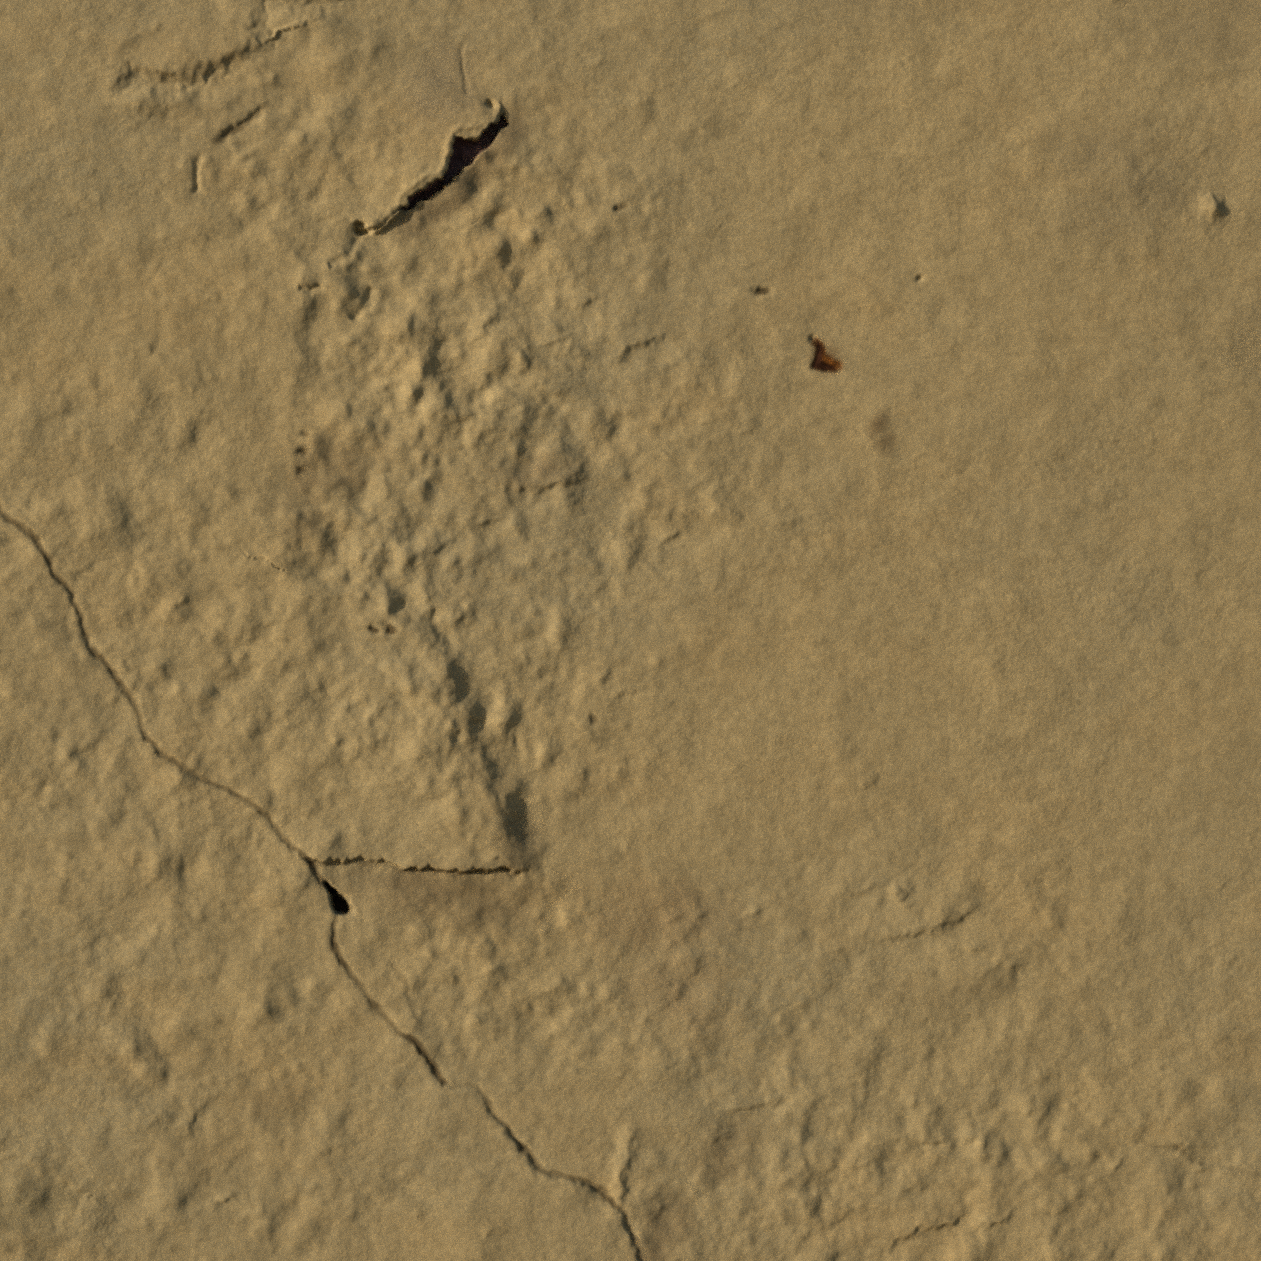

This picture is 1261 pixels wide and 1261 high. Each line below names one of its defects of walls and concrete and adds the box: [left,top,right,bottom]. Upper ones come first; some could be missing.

corrosion [811,339,841,371]
spalling [248,60,715,786]
spalling [287,771,565,953]
crack [332,940,345,965]
crack [405,1036,444,1083]